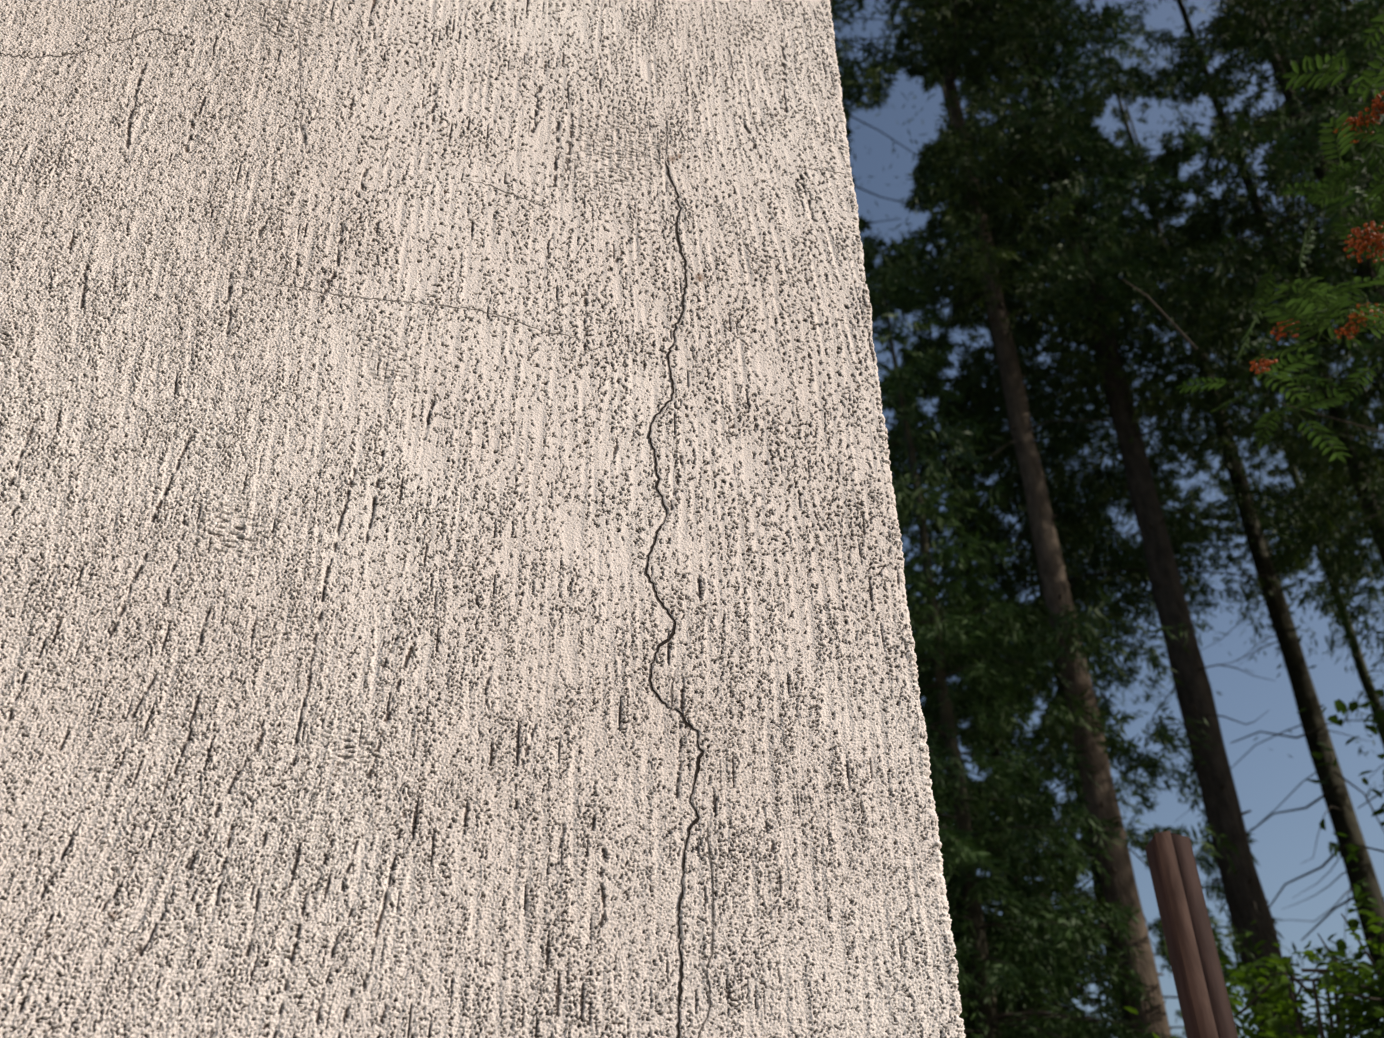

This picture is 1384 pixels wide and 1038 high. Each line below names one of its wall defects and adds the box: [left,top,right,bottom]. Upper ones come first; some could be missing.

crack [644,121,714,1038]